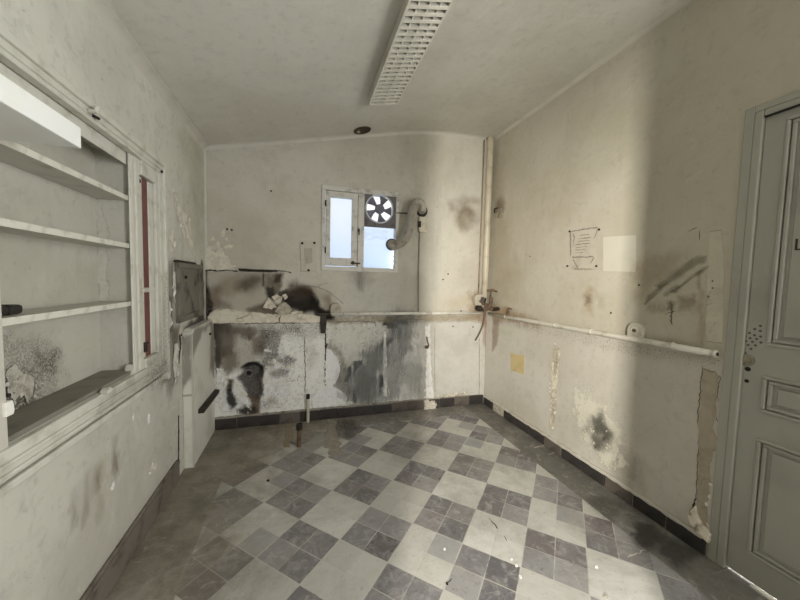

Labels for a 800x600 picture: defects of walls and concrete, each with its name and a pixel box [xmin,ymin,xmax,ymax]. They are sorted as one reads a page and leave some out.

peeling [205,229,235,272]
peeling [5,364,37,404]
damp [188,263,299,415]
peeling [688,369,718,543]